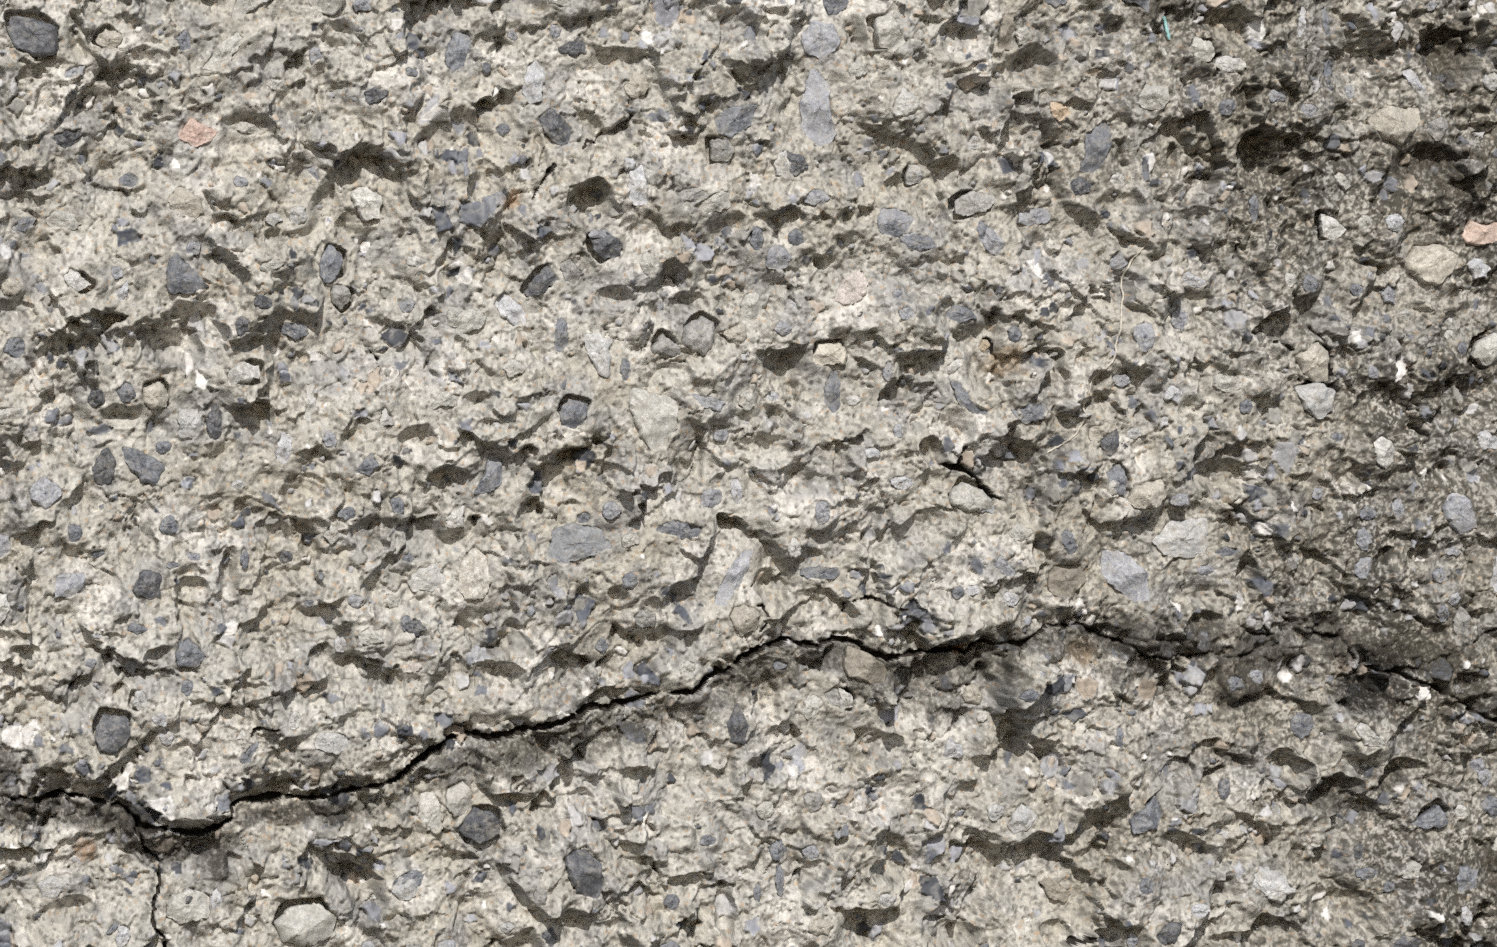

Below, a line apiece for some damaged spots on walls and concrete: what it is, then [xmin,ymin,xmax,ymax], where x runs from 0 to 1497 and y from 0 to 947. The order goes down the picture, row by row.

crack [938,446,1000,500]
crack [2,595,1497,947]